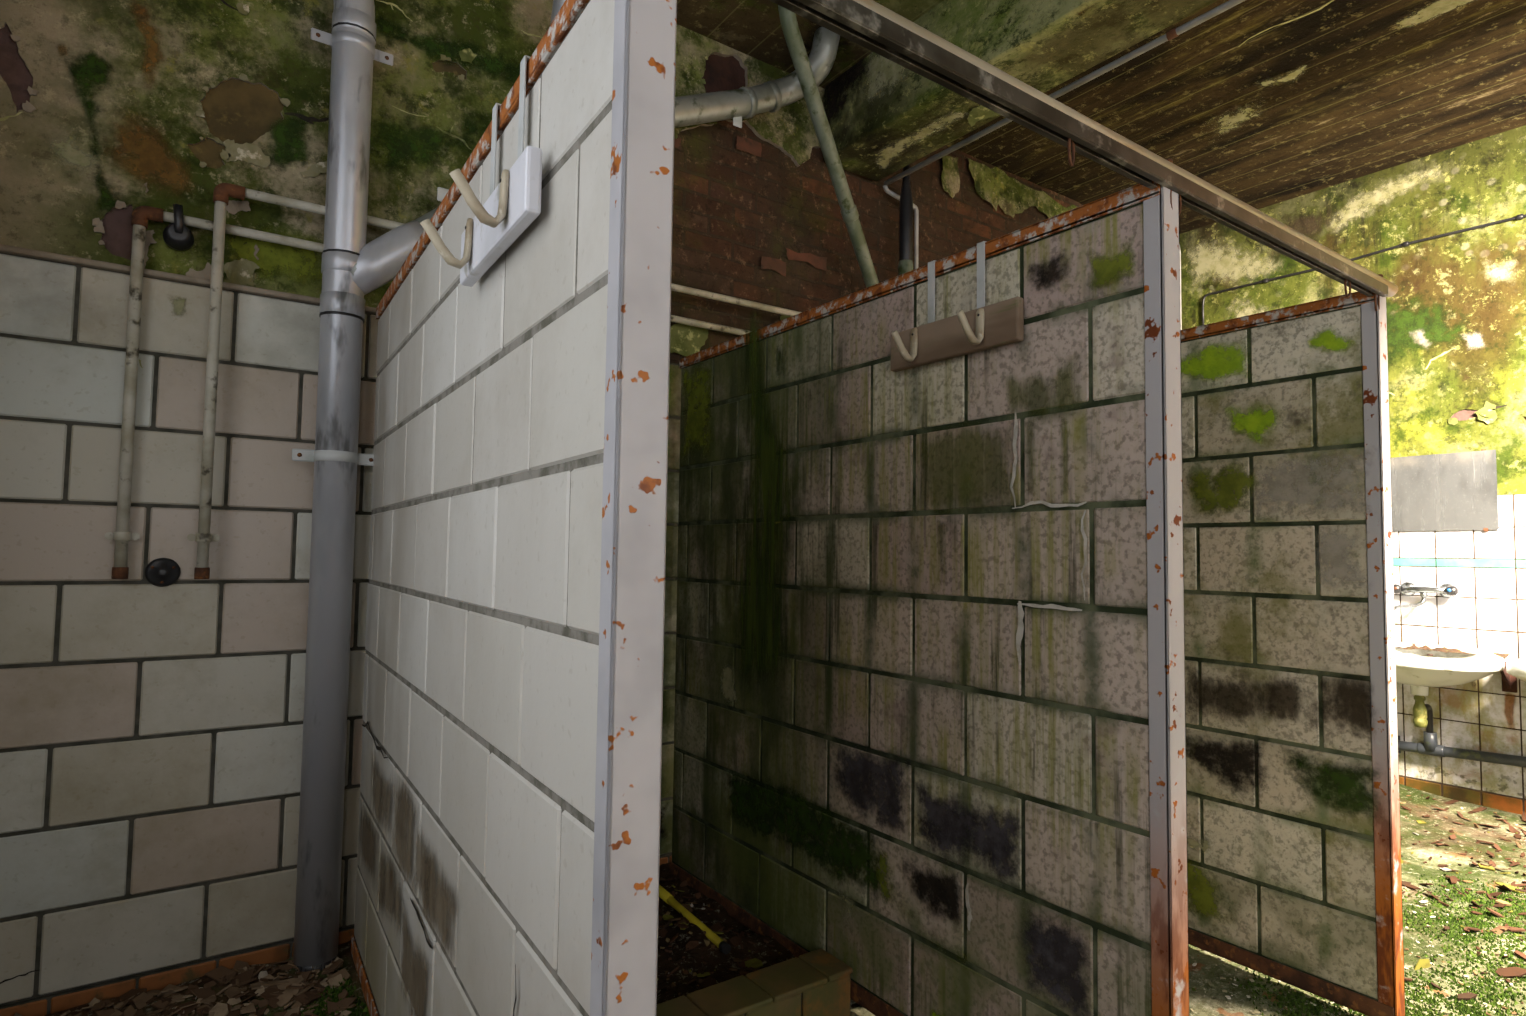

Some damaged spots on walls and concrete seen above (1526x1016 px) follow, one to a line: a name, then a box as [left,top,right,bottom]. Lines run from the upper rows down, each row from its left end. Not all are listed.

water stain [1396,0,1473,28]
flaking render [0,24,39,113]
flaking render [188,73,290,169]
flaking render [967,105,1000,127]
flaking render [941,156,1077,218]
flaking render [670,323,708,357]
flaking render [1448,401,1497,425]
water stain [1189,672,1300,720]
water stain [1321,679,1372,729]
water stain [1186,736,1264,790]
water stain [836,750,1020,931]
water stain [1021,915,1089,1016]